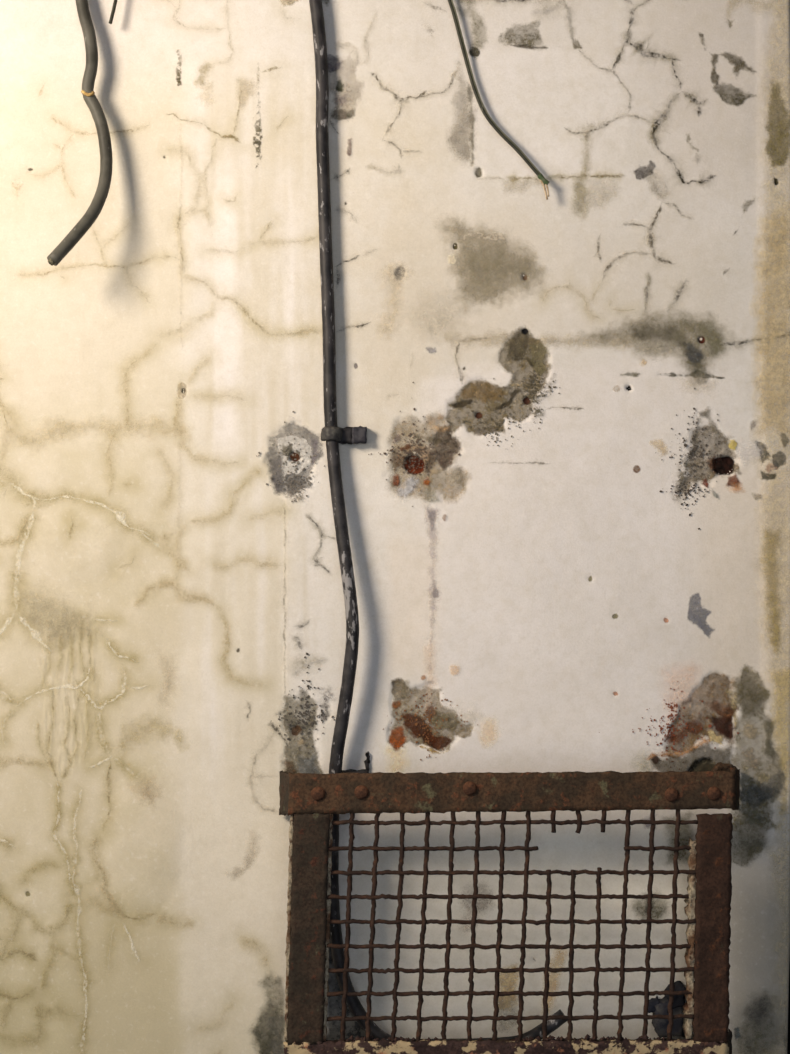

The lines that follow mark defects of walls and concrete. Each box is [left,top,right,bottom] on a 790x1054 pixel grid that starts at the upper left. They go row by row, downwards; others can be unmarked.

crack [372,73,455,144]
crack [569,6,713,295]
water stain [448,223,535,302]
water stain [760,68,790,454]
water stain [599,316,722,372]
spalling [368,329,560,507]
spalling [659,408,788,516]
crack [13,487,144,541]
spalling [383,675,478,760]
spalling [632,673,739,772]
water stain [732,667,789,864]
corrosion [498,973,516,1028]